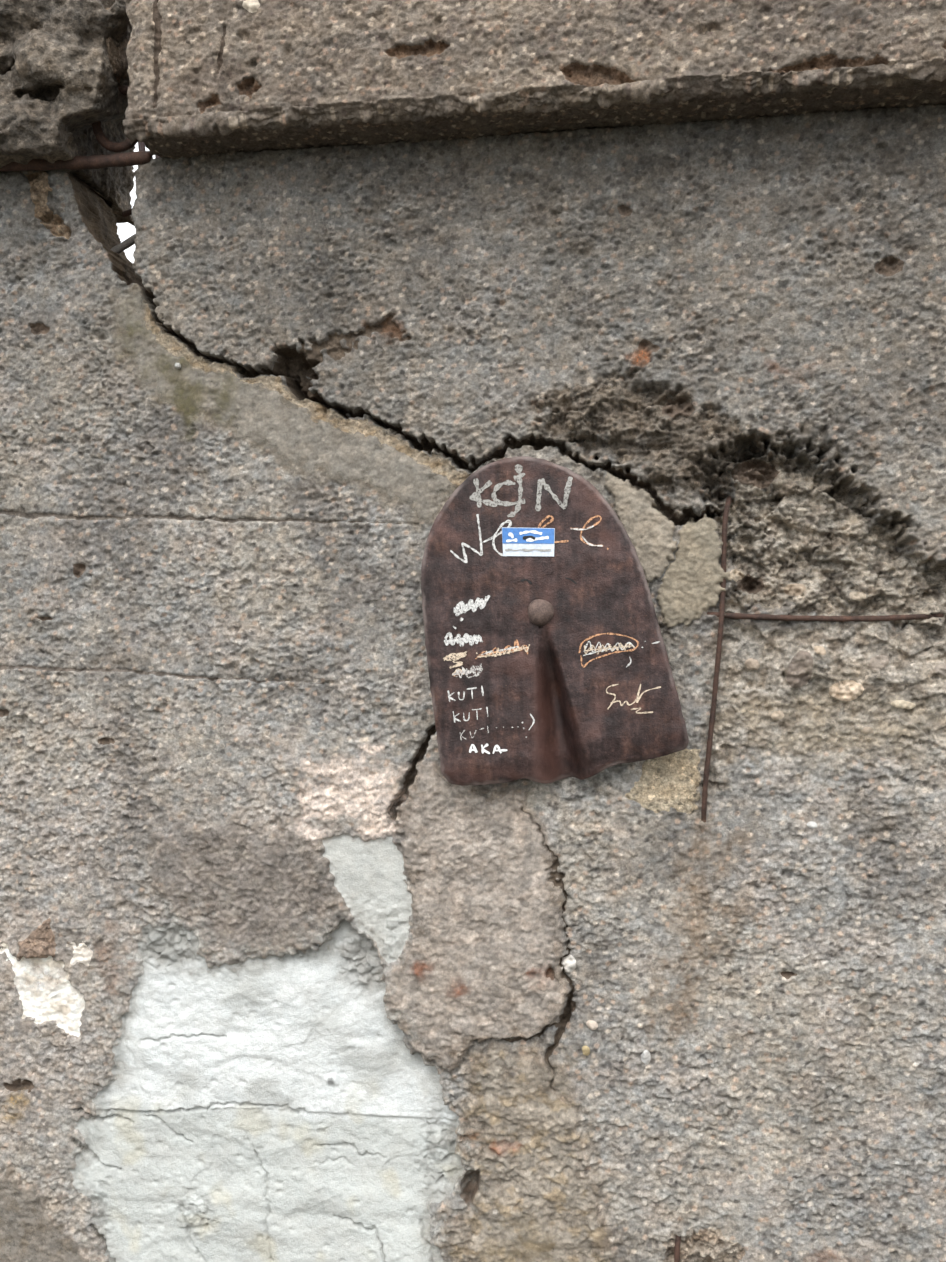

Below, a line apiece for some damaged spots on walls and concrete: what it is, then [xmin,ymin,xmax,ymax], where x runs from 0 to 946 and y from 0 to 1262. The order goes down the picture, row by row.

crack [141,290,724,526]
spalling [597,441,946,819]
crack [389,725,436,820]
spalling [0,918,93,1037]
crack [483,807,574,1090]
spalling [662,1227,746,1262]